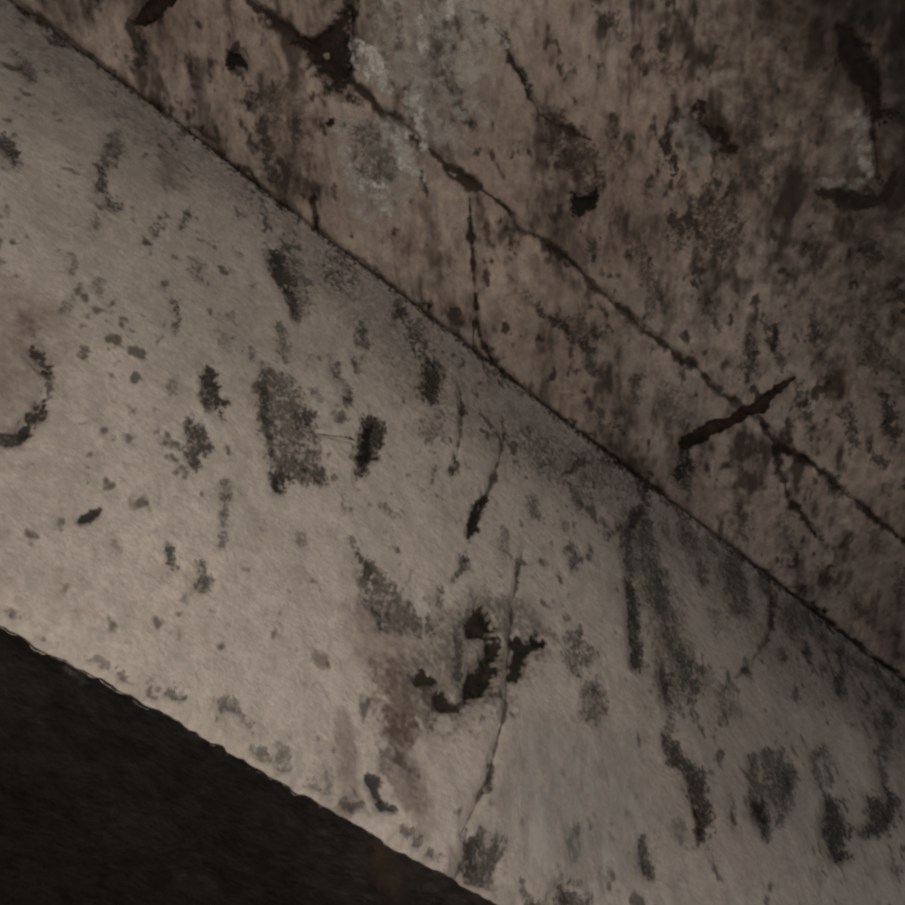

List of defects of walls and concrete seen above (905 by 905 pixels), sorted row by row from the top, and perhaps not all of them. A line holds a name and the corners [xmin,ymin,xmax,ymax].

crack [15,2,319,232]
leakage [333,0,506,224]
crack [246,0,905,546]
leakage [92,62,905,703]
leakage [77,507,103,524]
spalling [412,605,547,713]
crack [742,554,905,682]
leakage [692,805,706,847]
leakage [746,745,792,837]